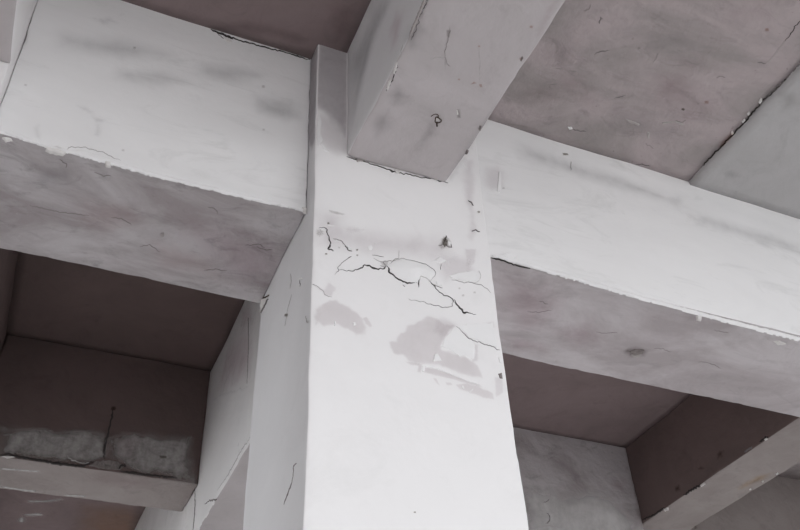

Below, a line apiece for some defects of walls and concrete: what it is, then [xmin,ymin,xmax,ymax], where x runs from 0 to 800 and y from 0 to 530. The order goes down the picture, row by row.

crack [211,29,310,60]
crack [704,64,800,165]
crack [319,223,491,315]
crack [102,407,115,459]
spalling [1,453,176,479]